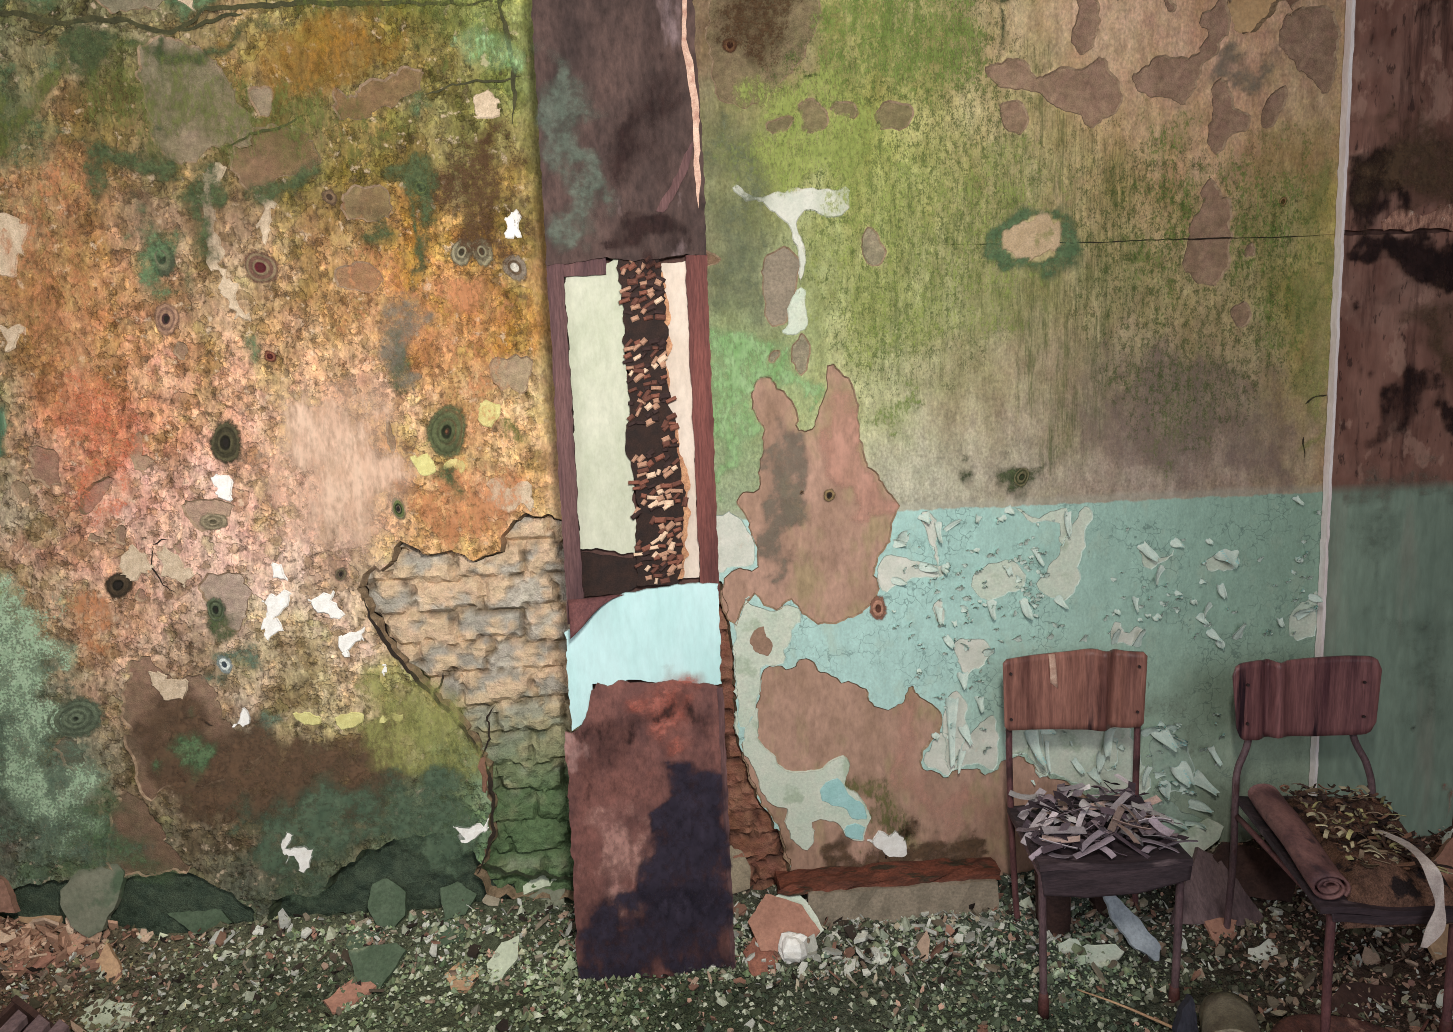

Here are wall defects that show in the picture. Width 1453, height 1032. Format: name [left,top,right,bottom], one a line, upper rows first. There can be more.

peeling [985,0,1341,155]
peeling [1182,178,1256,286]
peeling [716,246,1225,890]
peeling [1103,537,1264,651]
peeling [1263,540,1323,641]
flaking render [105,513,580,936]
flaking render [0,880,69,924]